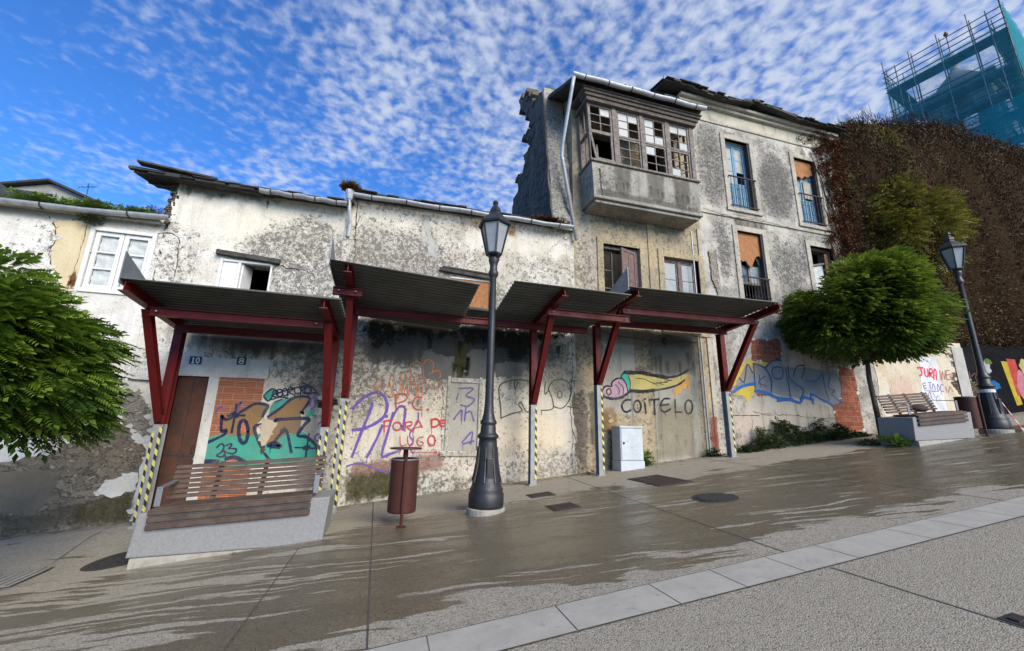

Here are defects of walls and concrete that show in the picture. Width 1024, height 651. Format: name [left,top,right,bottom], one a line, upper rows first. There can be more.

peeling [46,218,92,295]
leakage [362,318,567,378]
spalling [751,338,782,363]
spalling [832,365,865,432]
peeling [0,386,154,538]